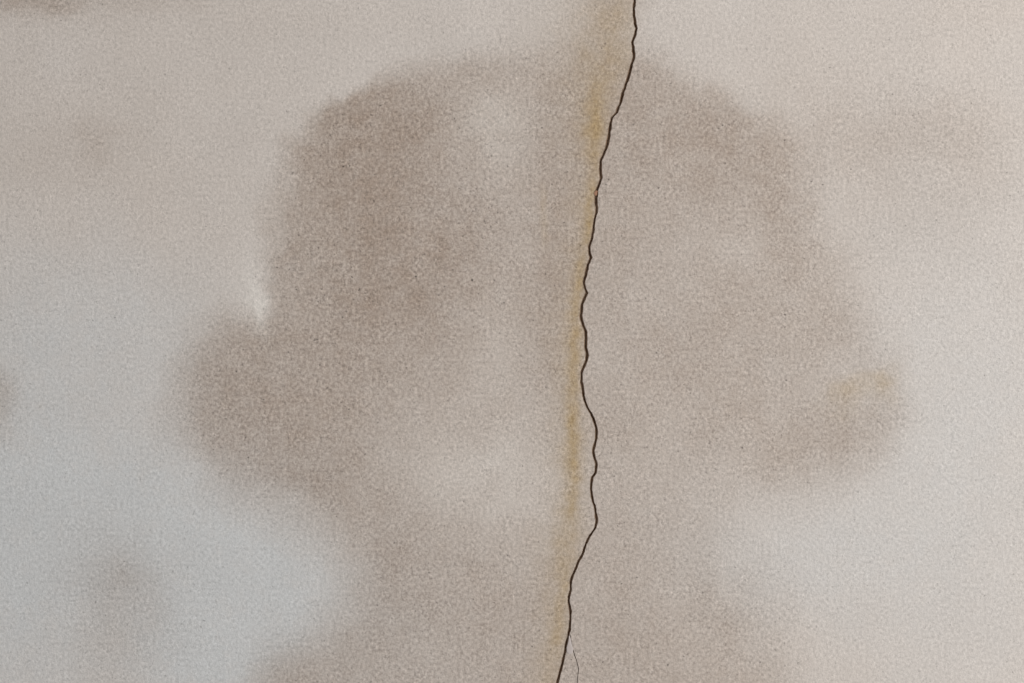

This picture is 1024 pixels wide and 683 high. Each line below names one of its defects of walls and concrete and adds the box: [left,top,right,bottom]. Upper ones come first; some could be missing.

damp [135,16,560,683]
rust [511,0,635,683]
crack [556,0,638,683]
damp [559,0,1024,683]